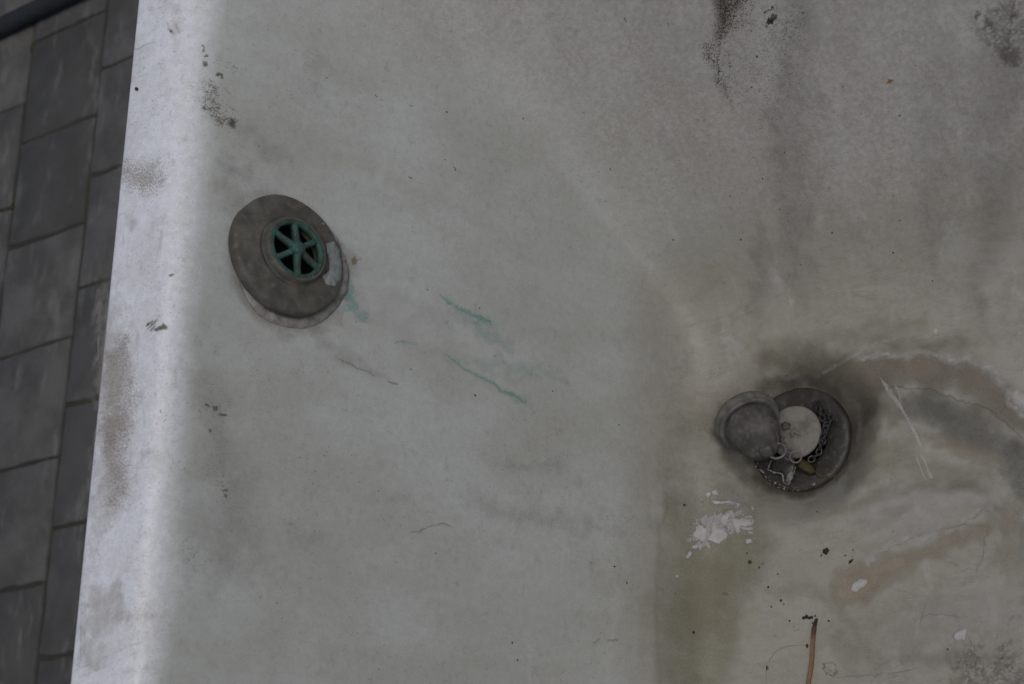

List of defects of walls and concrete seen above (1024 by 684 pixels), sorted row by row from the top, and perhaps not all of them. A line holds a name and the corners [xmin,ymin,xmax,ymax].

leakage [703,0,748,89]
leakage [774,352,1024,425]
peeling [685,489,759,559]
leakage [835,527,983,602]